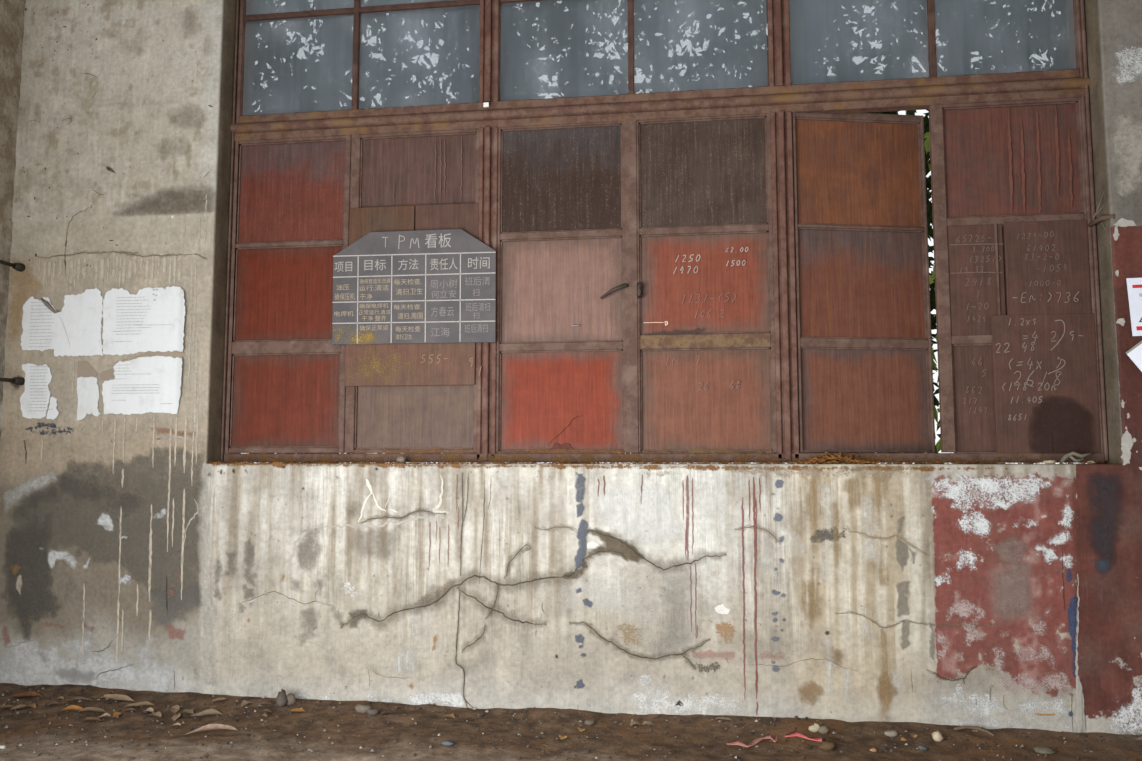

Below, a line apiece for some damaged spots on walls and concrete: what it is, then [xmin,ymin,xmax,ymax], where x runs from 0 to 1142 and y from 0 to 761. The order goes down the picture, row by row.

peeling [1113,218,1136,241]
water stain [0,194,207,691]
peeling [1121,400,1142,470]
crack [214,476,779,708]
corrosion [210,443,1104,566]
peeling [934,551,977,586]
peeling [928,472,1055,536]
peeling [1035,495,1074,572]
corrosion [716,622,735,643]
peeling [935,600,986,659]
corrosion [880,634,895,710]
water stain [1109,687,1142,735]